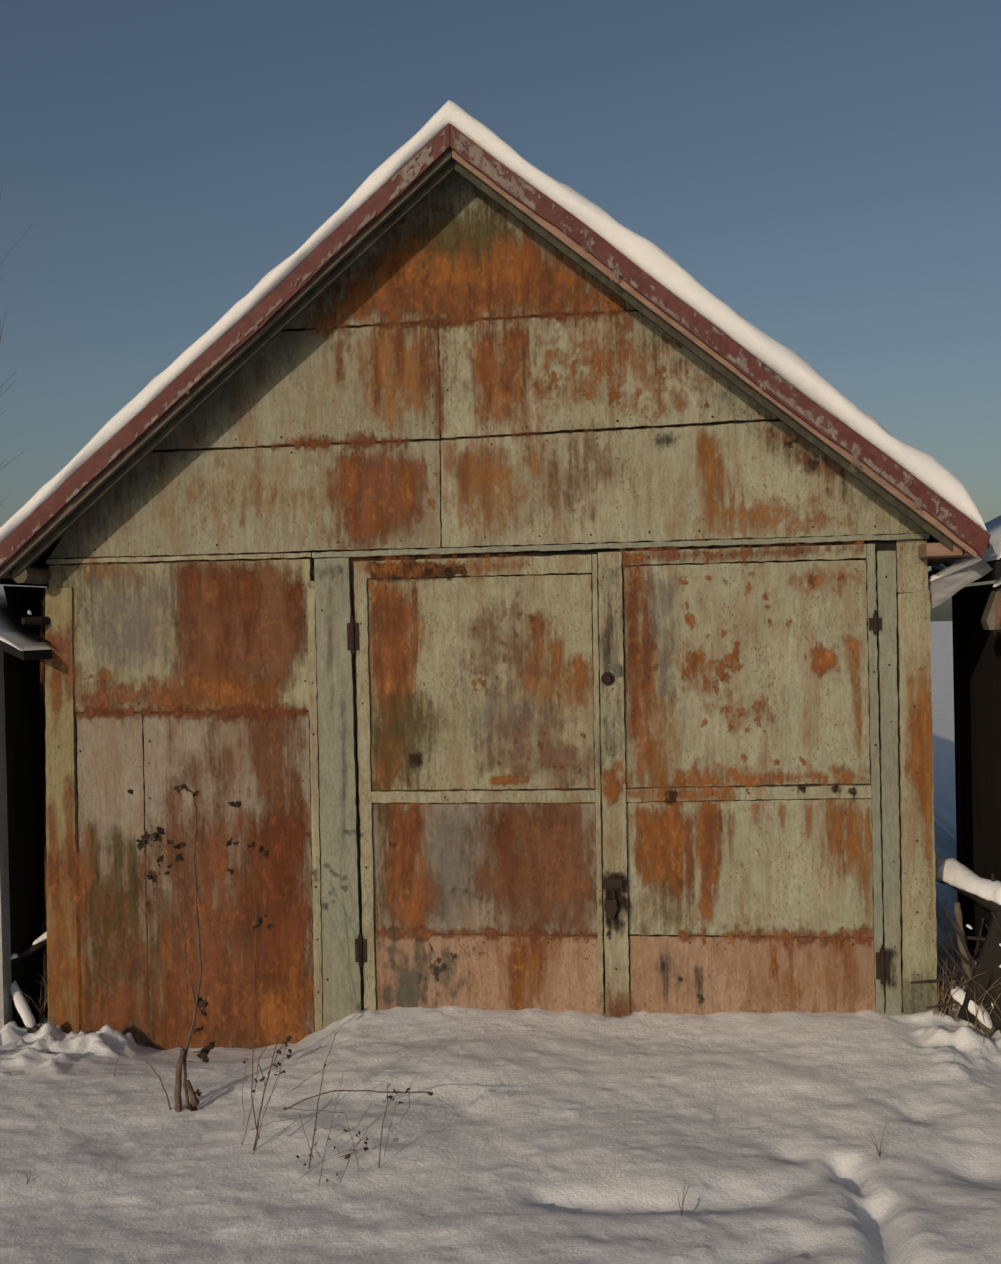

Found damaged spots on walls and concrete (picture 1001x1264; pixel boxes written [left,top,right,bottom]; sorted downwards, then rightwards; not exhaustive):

peeling [389,131,556,210]
peeling [291,211,376,287]
peeling [135,299,283,438]
peeling [608,254,971,544]
peeling [66,449,121,502]
corrosion [271,215,872,1010]
corrosion [40,554,314,1050]
corrosion [905,667,932,867]
corrosion [608,992,633,1017]